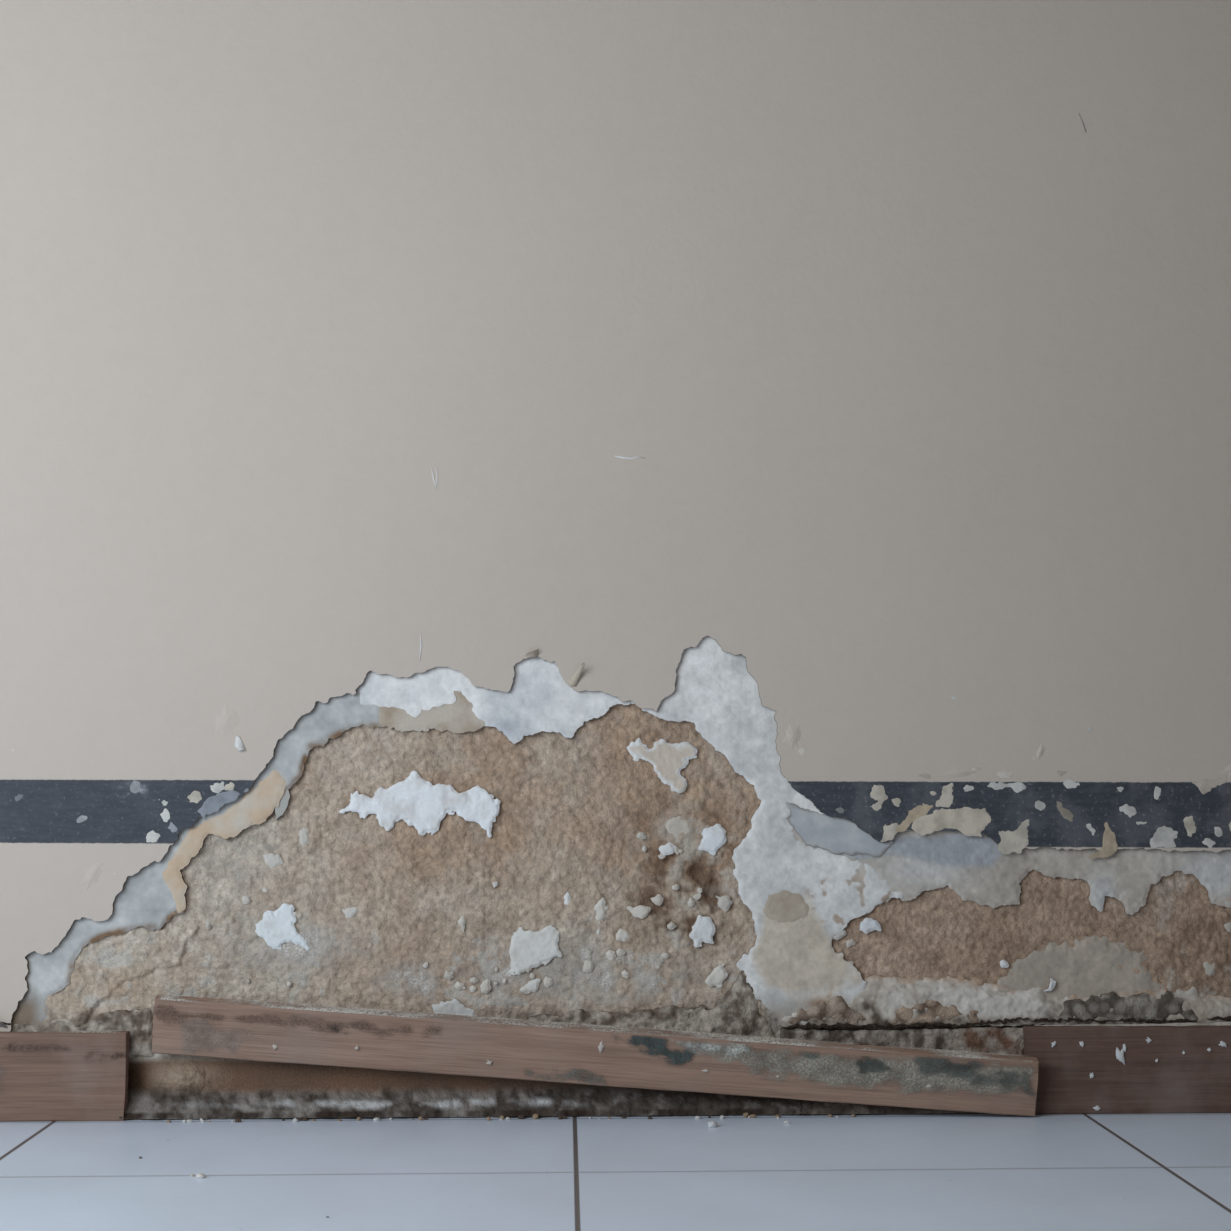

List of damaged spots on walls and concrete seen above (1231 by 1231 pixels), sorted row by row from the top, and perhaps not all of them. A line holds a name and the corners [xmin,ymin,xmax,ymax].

water stain [258,928,329,966]
flaking render [0,636,1231,1120]